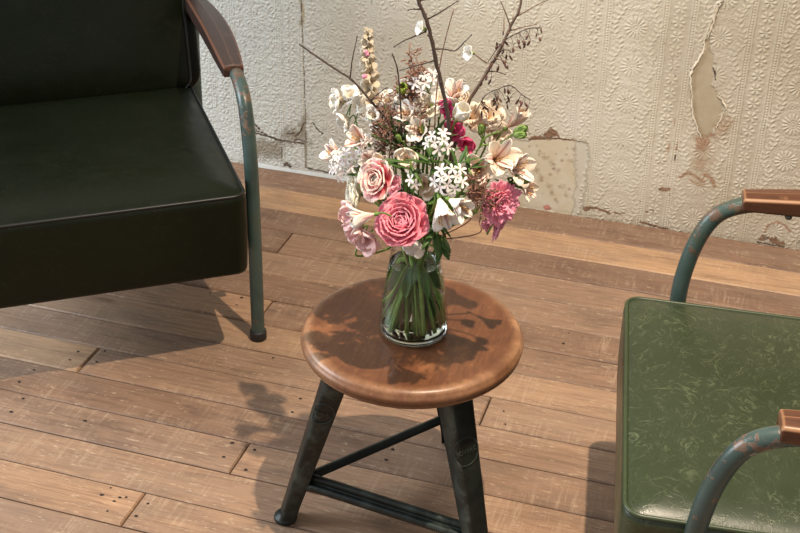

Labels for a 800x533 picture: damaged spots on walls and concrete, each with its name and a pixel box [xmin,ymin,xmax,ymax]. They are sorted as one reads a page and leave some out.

crack [255,3,335,175]
peeling [689,37,727,138]
spalling [512,127,625,217]